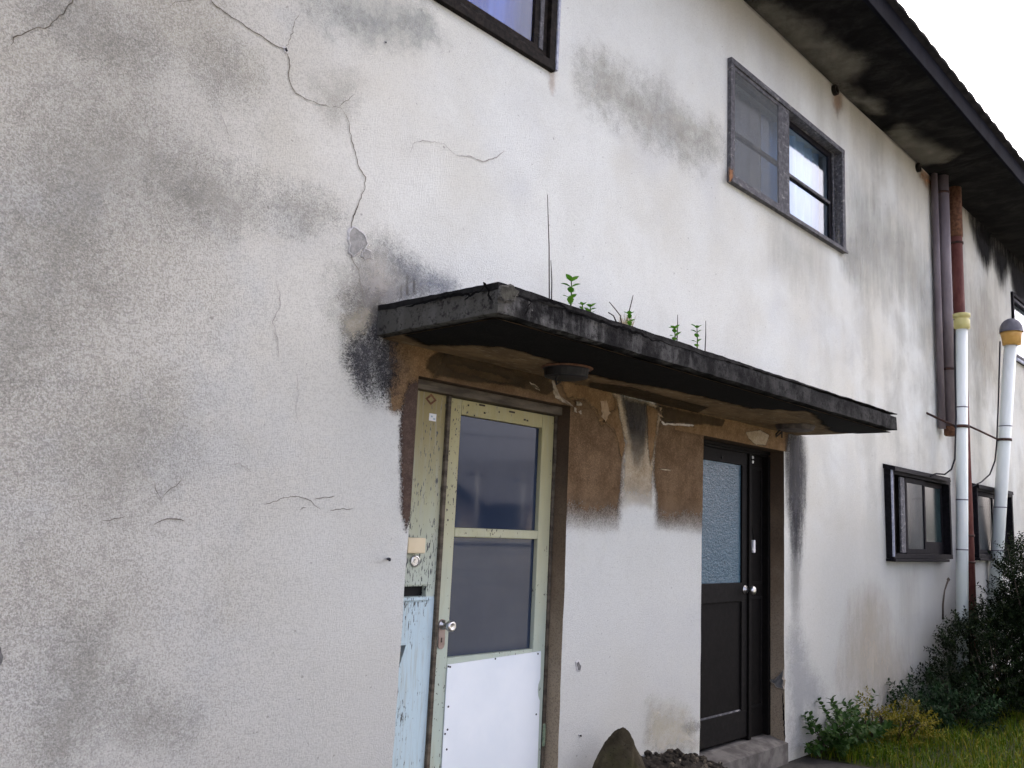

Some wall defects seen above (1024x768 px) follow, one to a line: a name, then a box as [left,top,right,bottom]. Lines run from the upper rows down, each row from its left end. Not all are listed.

crack [11,0,74,45]
crack [174,0,366,228]
crack [411,140,504,162]
spalling [347,226,372,261]
water stain [969,213,1024,306]
peeling [427,352,725,427]
water stain [346,255,891,556]
crack [267,496,349,511]